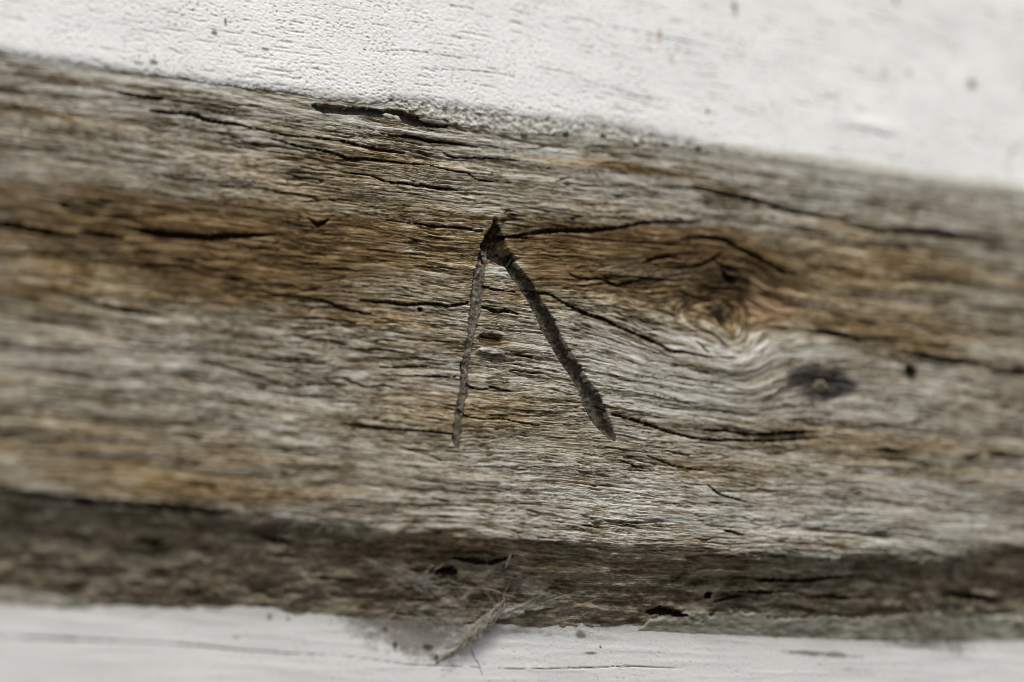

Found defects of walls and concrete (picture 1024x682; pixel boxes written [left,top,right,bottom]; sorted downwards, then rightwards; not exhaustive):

crack [118,92,520,191]
crack [0,220,275,269]
crack [256,218,796,359]
crack [584,405,819,502]